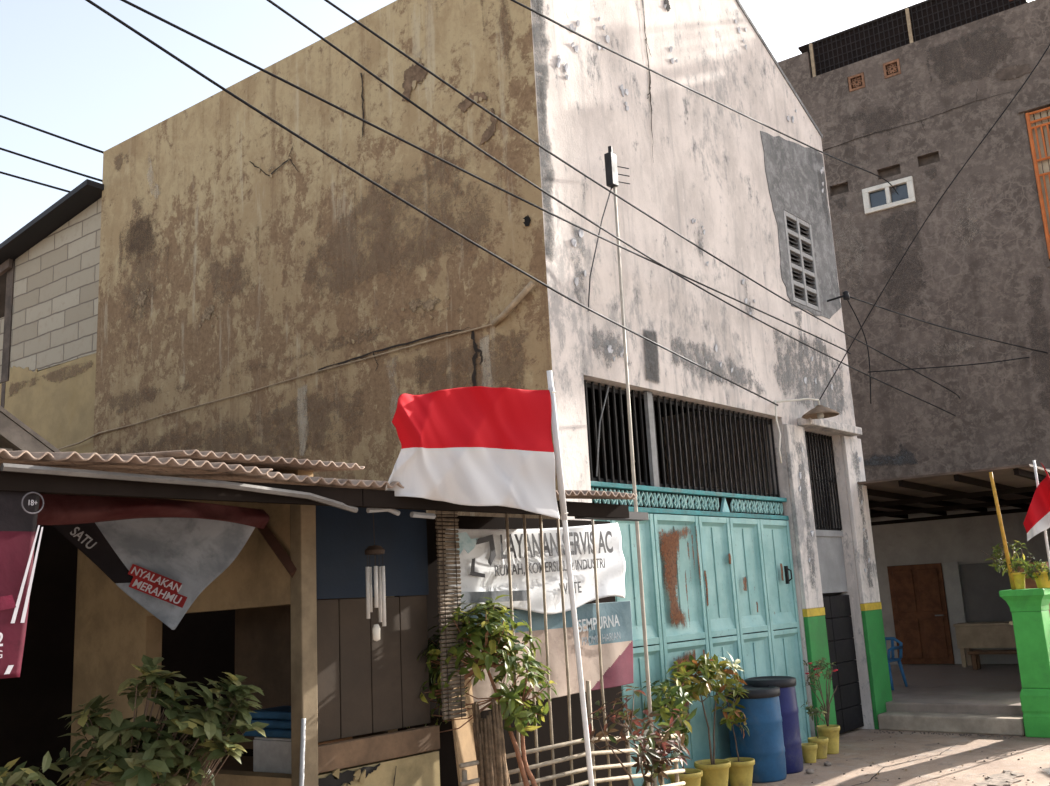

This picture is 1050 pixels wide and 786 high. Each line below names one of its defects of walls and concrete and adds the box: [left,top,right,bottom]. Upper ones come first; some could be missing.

flaking render [402,57,427,102]
crack [642,5,654,163]
flaking render [457,90,499,144]
damp [531,0,554,261]
crack [249,142,299,176]
corrosion [659,526,709,627]
spalling [318,763,380,786]